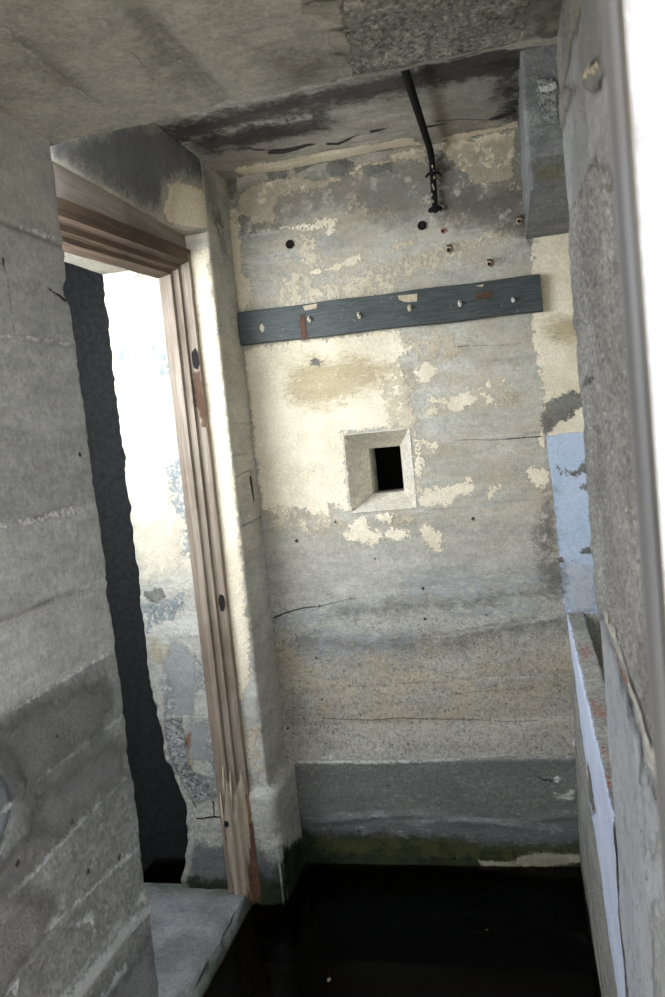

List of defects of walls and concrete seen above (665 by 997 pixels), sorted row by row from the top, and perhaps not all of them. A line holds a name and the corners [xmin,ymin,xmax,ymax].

damp [55,47,529,205]
peeling [226,137,522,312]
peeling [438,121,520,186]
corrosion [192,371,206,427]
peeling [243,329,518,560]
crack [273,598,354,648]